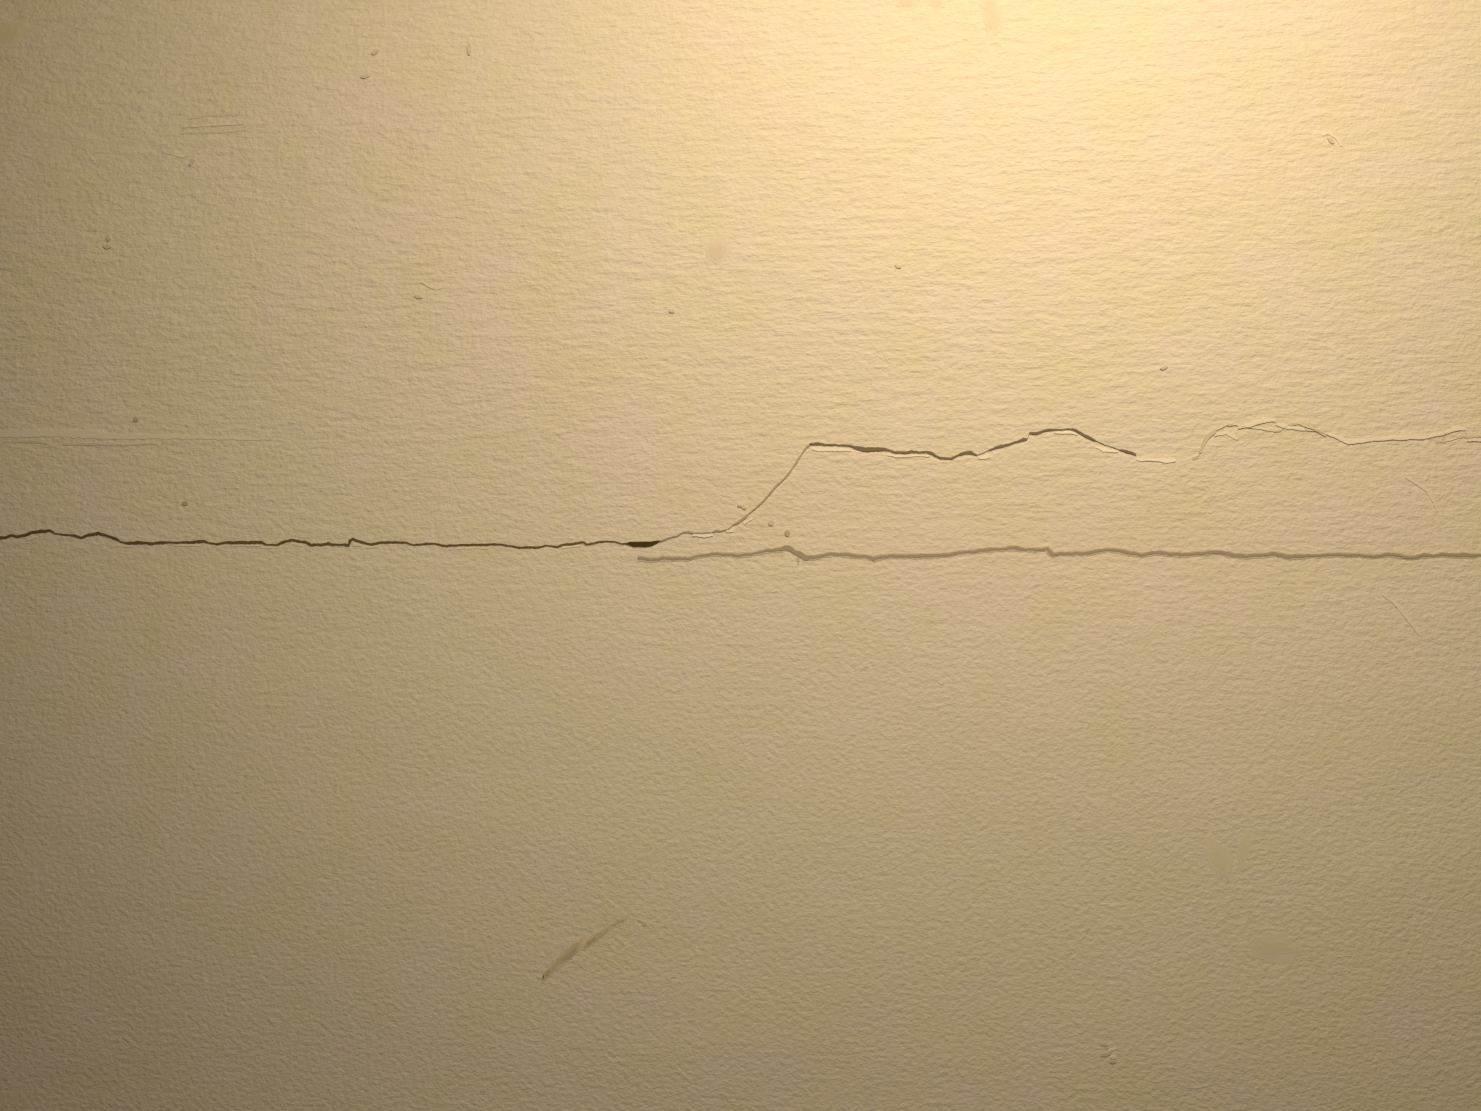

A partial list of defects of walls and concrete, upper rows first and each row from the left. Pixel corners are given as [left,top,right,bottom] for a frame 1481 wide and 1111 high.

crack [0,428,1481,565]